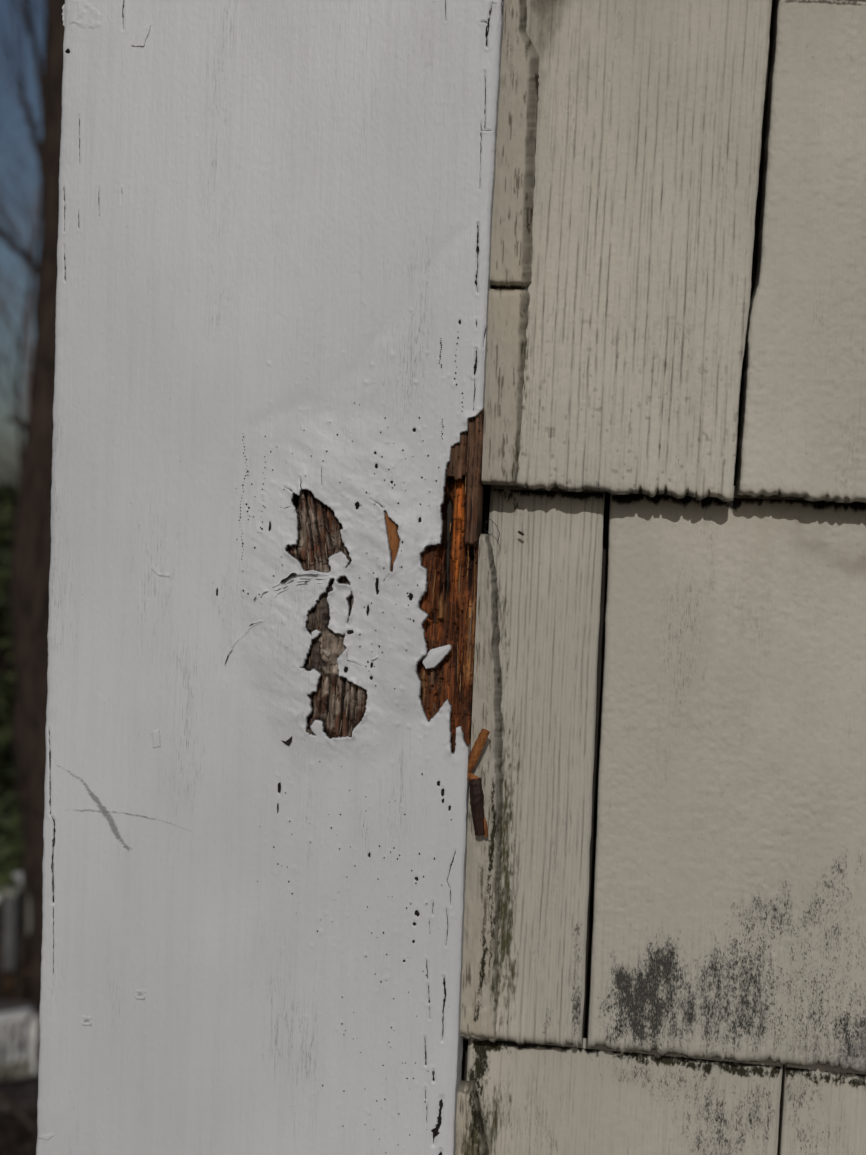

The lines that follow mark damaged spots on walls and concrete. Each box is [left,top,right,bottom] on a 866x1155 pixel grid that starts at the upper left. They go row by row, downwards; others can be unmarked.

crack [482,0,503,46]
crack [480,78,492,170]
crack [473,225,481,292]
peeling [385,512,400,571]
peeling [287,490,367,738]
water stain [598,856,866,1069]